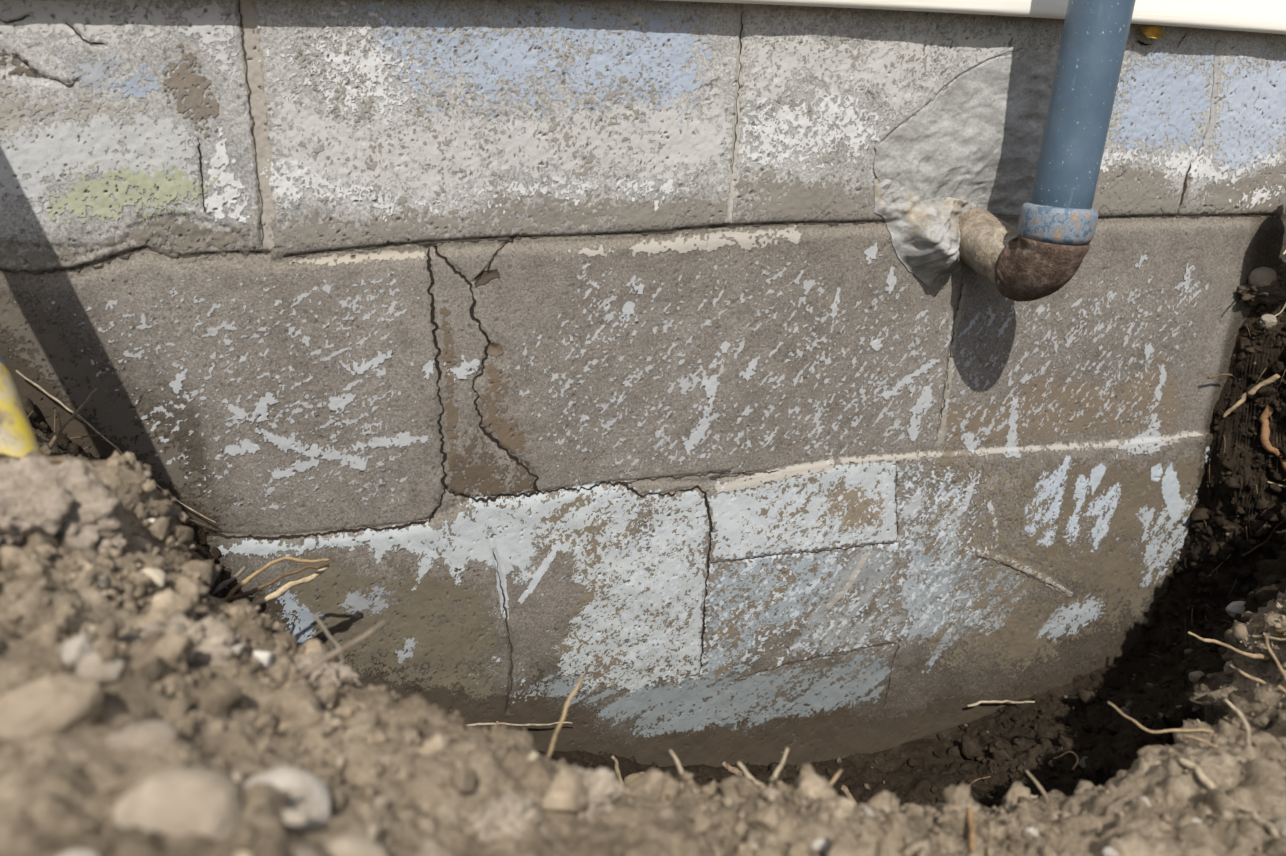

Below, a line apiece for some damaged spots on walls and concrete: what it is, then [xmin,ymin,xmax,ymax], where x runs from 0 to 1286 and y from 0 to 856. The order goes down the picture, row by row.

crack [0,1,899,669]
crack [493,551,513,708]
peeling [0,0,1049,520]
peeling [217,248,1209,738]
crack [732,641,900,705]